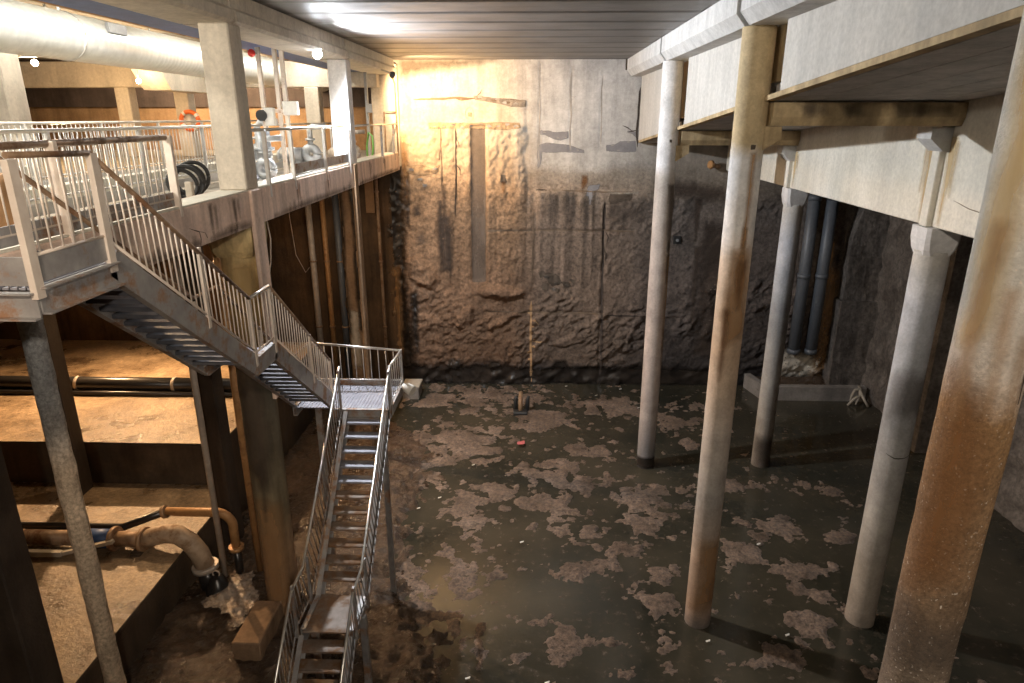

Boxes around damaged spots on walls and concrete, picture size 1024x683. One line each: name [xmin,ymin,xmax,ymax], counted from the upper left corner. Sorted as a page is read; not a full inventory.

leakage [370,159,643,385]
corrosion [721,154,755,355]
leakage [660,368,709,385]
corrosion [695,543,718,606]